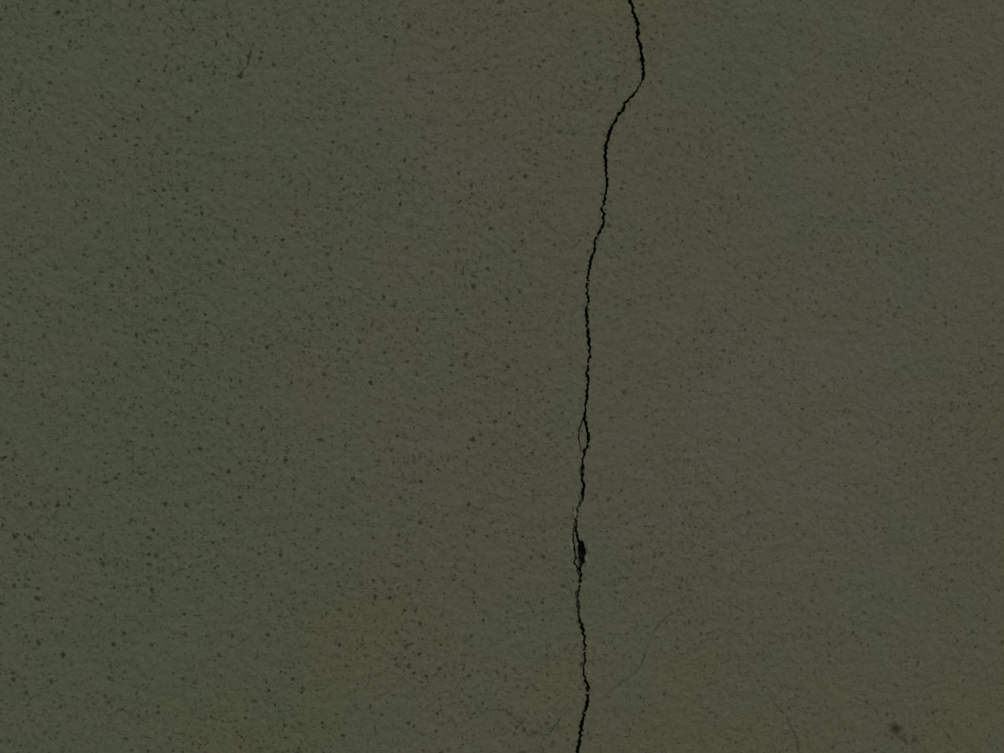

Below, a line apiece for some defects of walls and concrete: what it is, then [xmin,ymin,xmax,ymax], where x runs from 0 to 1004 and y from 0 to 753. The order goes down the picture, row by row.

crack [569,0,645,753]